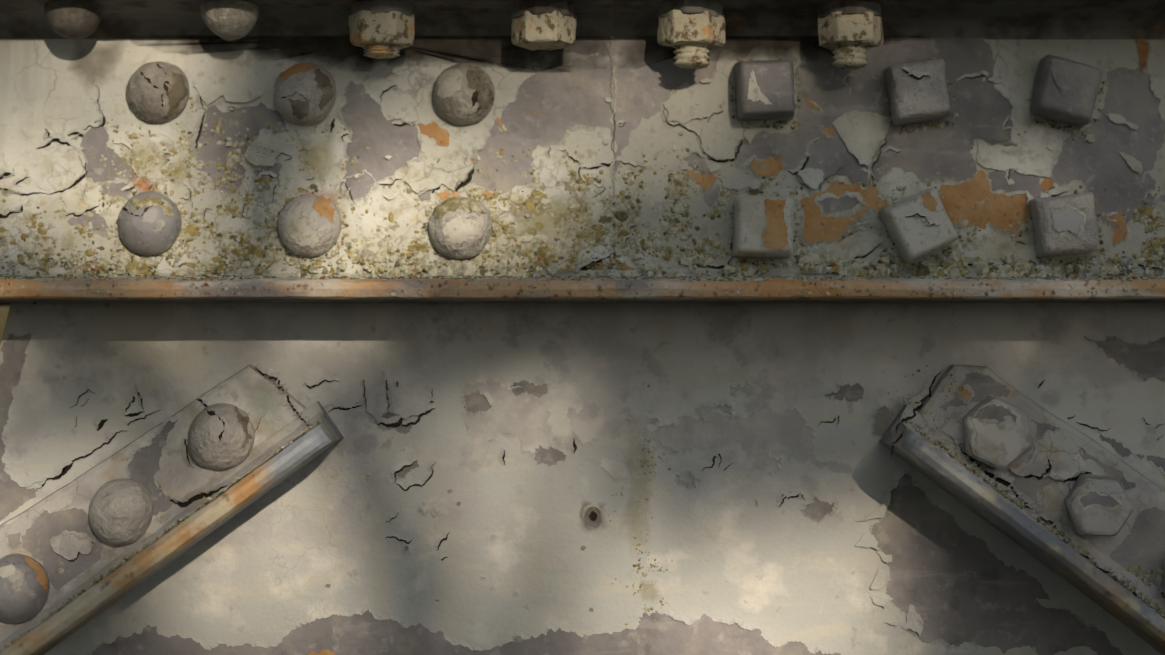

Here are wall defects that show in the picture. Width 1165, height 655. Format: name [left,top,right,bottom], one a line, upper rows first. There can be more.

crack [0,78,293,224]
crack [379,157,475,196]
peeling [441,216,479,245]
peeling [129,24,1165,237]
rust [761,181,888,251]
rust [921,170,1053,236]
peeling [0,331,103,590]
crack [35,385,161,490]
crack [154,364,436,516]
rust [9,553,48,593]
peeling [857,468,1123,655]
peeling [92,607,841,655]